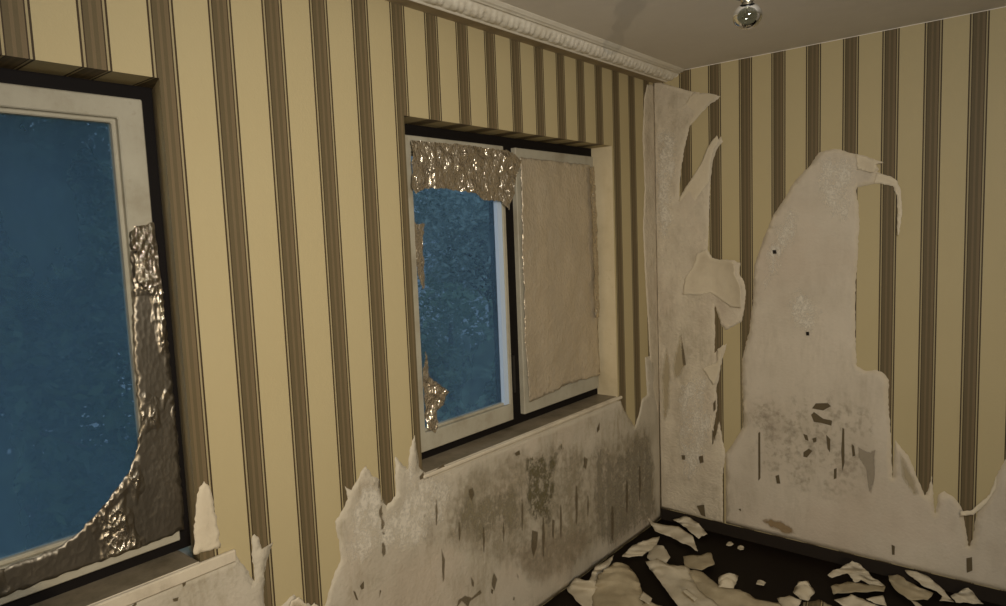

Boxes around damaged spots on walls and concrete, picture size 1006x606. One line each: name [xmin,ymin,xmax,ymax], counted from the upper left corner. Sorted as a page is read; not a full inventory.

damp [353,432,655,573]
spalling [803,403,855,479]
damp [859,448,875,490]
damp [457,578,481,606]